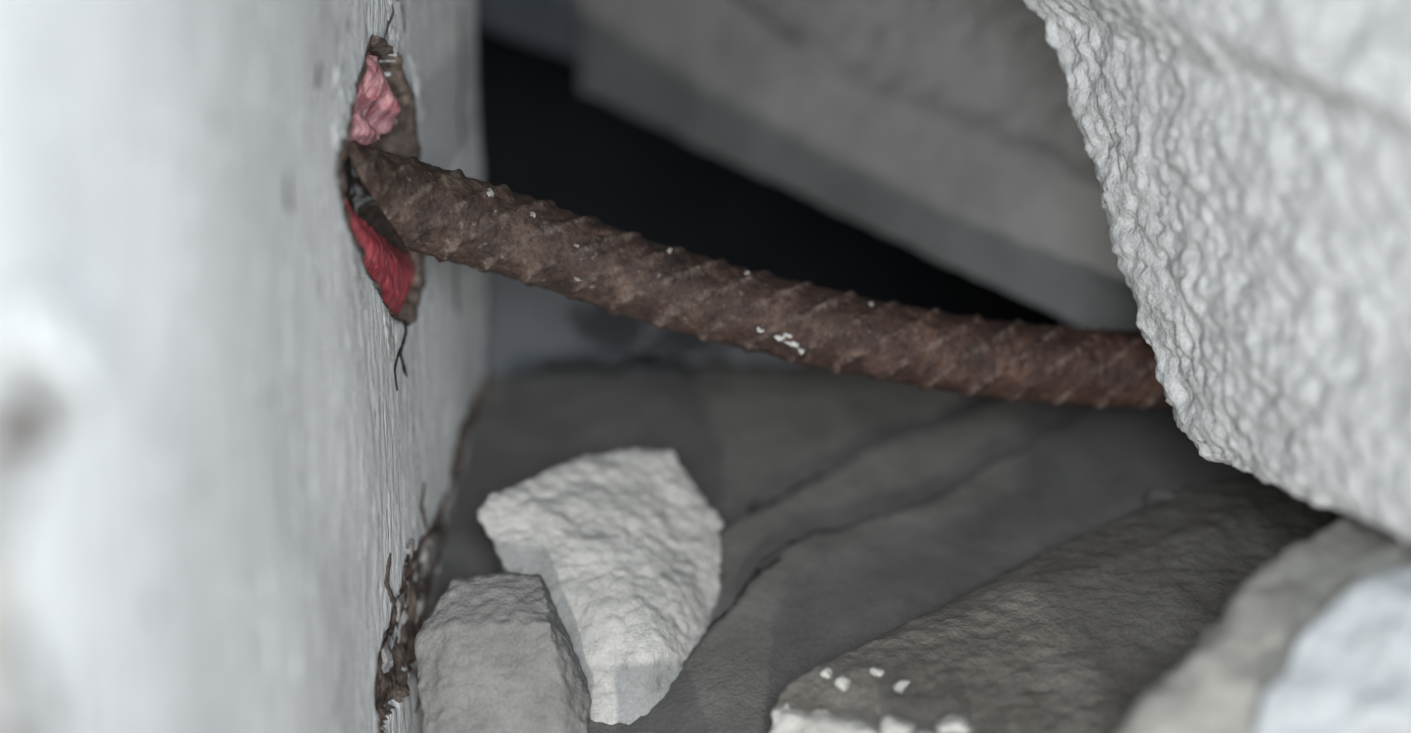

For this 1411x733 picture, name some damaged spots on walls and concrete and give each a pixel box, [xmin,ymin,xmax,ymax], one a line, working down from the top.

crack [383,0,406,39]
spalling [332,0,1173,410]